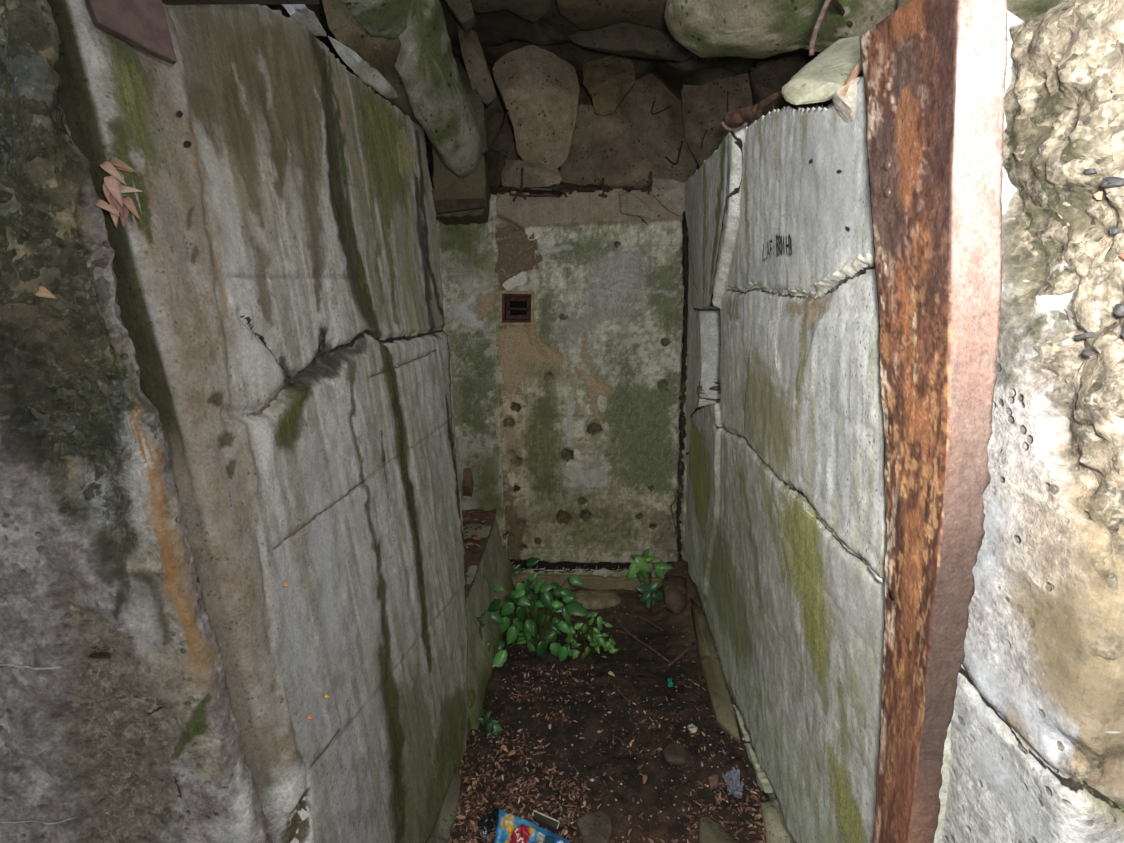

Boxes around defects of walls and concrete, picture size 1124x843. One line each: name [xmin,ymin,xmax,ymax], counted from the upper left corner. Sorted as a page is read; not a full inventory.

crack [240,315,310,416]
leakage [177,5,527,843]
crack [330,330,444,378]
crack [510,132,884,604]
rust [127,402,216,687]
crack [959,663,1124,812]
leakage [1016,569,1124,775]